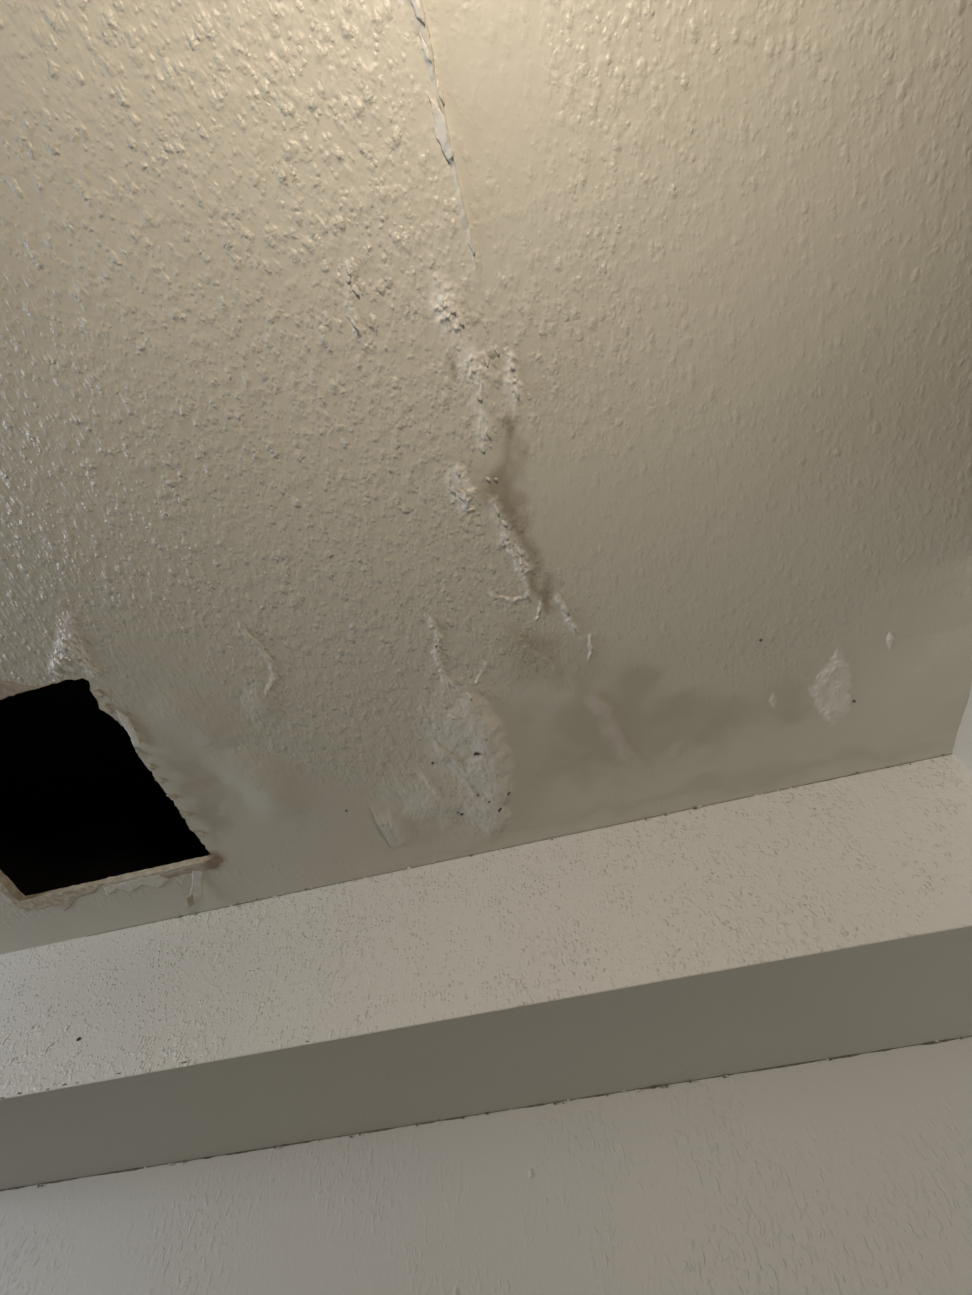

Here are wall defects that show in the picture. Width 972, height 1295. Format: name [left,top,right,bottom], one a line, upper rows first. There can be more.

crack [404,0,479,276]
peeling [443,459,533,577]
peeling [806,645,853,730]